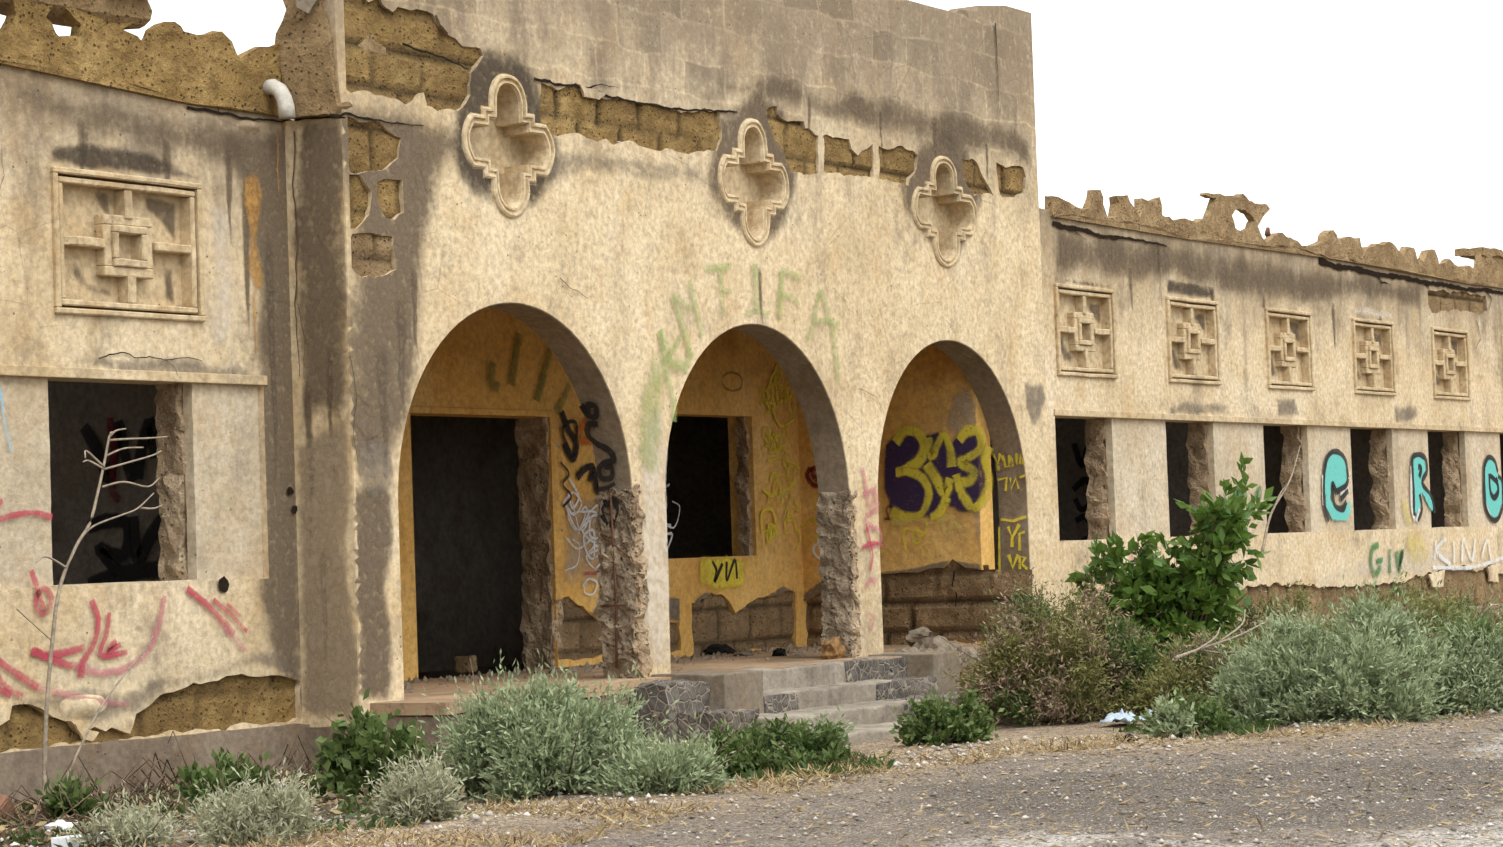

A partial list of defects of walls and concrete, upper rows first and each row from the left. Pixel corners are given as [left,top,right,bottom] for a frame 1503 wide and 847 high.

flaking render [344,0,481,111]
flaking render [348,117,401,277]
flaking render [537,84,720,154]
flaking render [767,106,915,185]
water stain [712,80,1028,237]
flaking render [963,159,1024,198]
water stain [53,51,576,718]
spalling [549,483,653,679]
spalling [669,488,862,658]
flaking render [881,560,1033,645]
flaking render [1224,564,1503,628]
flaking render [0,674,296,753]